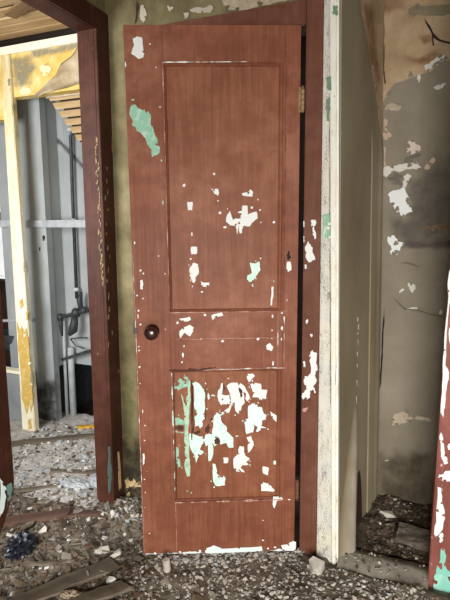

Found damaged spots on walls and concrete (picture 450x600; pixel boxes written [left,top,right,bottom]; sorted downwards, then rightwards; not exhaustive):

crack [424,18,450,46]
peeling [129,99,162,162]
flaking render [361,0,450,219]
peeling [189,246,209,293]
peeling [218,205,261,233]
peeling [247,258,261,287]
peeling [303,214,332,270]
peeling [439,270,450,416]
peeling [302,346,318,412]
peeling [174,373,277,488]
peeling [432,433,450,593]
peeling [199,540,296,554]